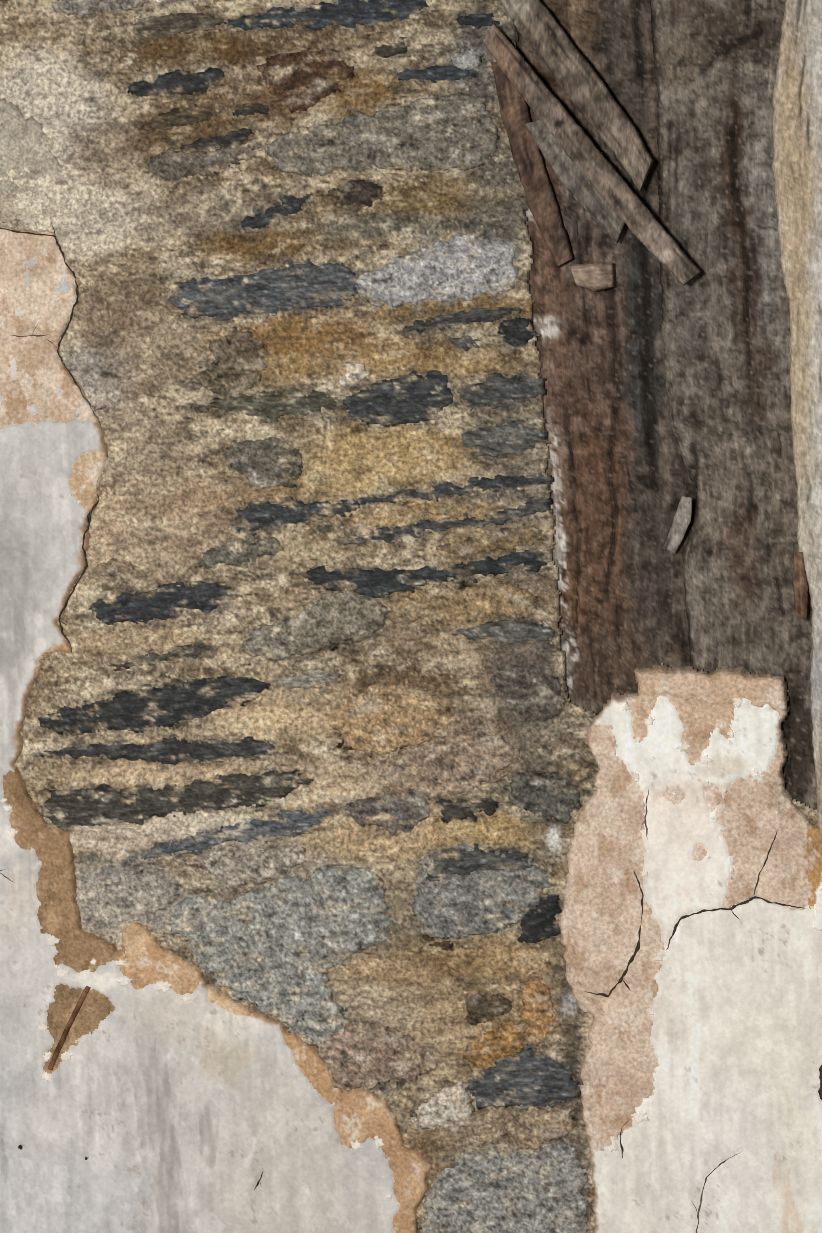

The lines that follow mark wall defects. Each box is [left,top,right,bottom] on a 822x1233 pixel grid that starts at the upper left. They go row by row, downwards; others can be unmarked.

flaking render [68,451,108,513]
flaking render [31,643,71,680]
crack [641,790,649,840]
flaking render [622,665,822,910]
flaking render [0,768,256,1081]
flaking render [558,722,686,1155]
crack [585,832,806,997]
flaking render [280,1025,432,1233]
crack [692,1151,742,1233]
crack [814,1065,822,1100]